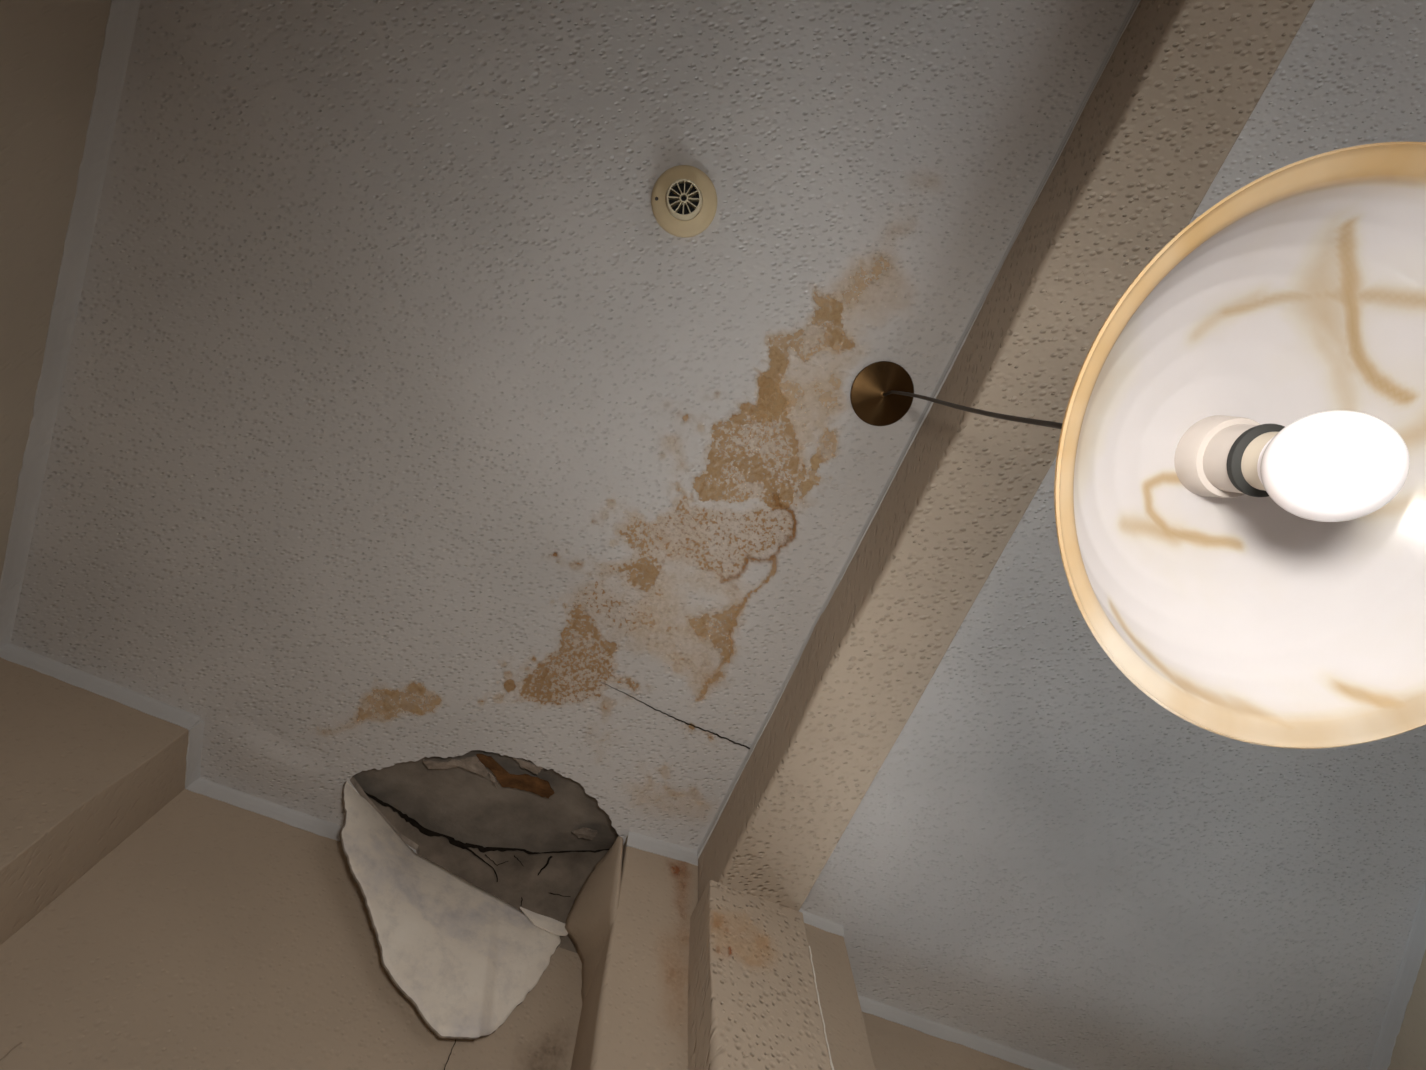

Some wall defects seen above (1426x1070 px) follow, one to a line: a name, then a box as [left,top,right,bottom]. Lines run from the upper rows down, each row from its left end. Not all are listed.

damp [504,258,889,709]
damp [358,683,441,720]
flaking render [368,796,609,953]